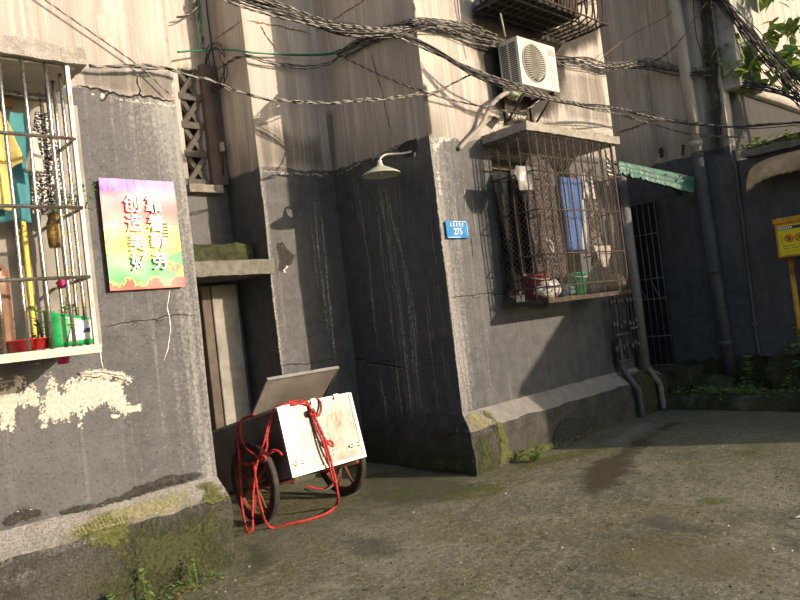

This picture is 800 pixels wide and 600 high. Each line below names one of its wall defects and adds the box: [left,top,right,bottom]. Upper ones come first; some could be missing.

crack [105,314,197,328]
spalling [276,242,295,273]
damp [310,202,336,364]
damp [375,184,423,418]
crack [447,292,507,300]
peeling [0,374,142,433]
damp [582,424,650,493]